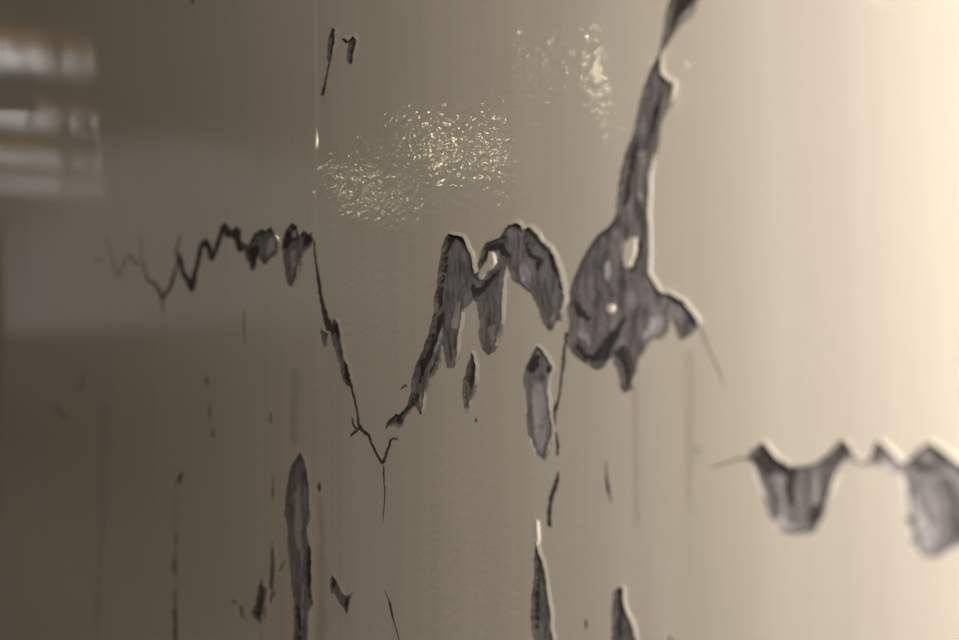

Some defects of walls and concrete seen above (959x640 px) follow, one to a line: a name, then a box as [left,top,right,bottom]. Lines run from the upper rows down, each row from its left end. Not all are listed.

spalling [321,25,359,96]
spalling [384,0,702,430]
crack [95,219,398,521]
spalling [523,343,556,462]
spalling [232,450,321,640]
crack [384,590,400,640]
spalling [530,519,557,640]
spalling [611,584,639,640]
spalling [745,437,959,558]